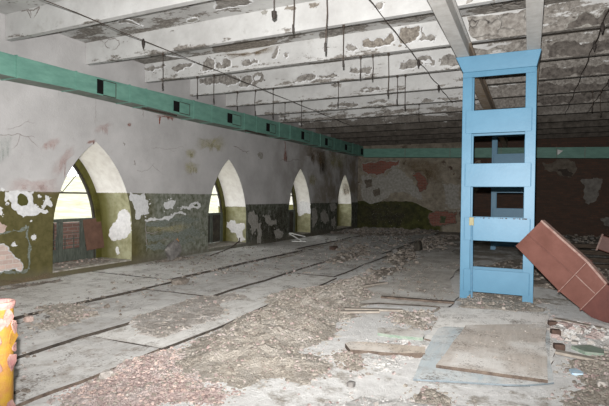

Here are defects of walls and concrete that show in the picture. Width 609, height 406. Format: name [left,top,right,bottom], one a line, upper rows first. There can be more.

spalling [310,25,354,39]
spalling [345,12,437,53]
peeling [467,0,527,55]
spalling [565,7,609,30]
spalling [131,40,289,89]
spalling [294,71,341,88]
spalling [349,66,373,76]
peeling [0,188,53,274]
peeling [109,192,201,255]
peeling [358,159,428,204]
spalling [427,182,461,226]
peeling [580,178,603,204]